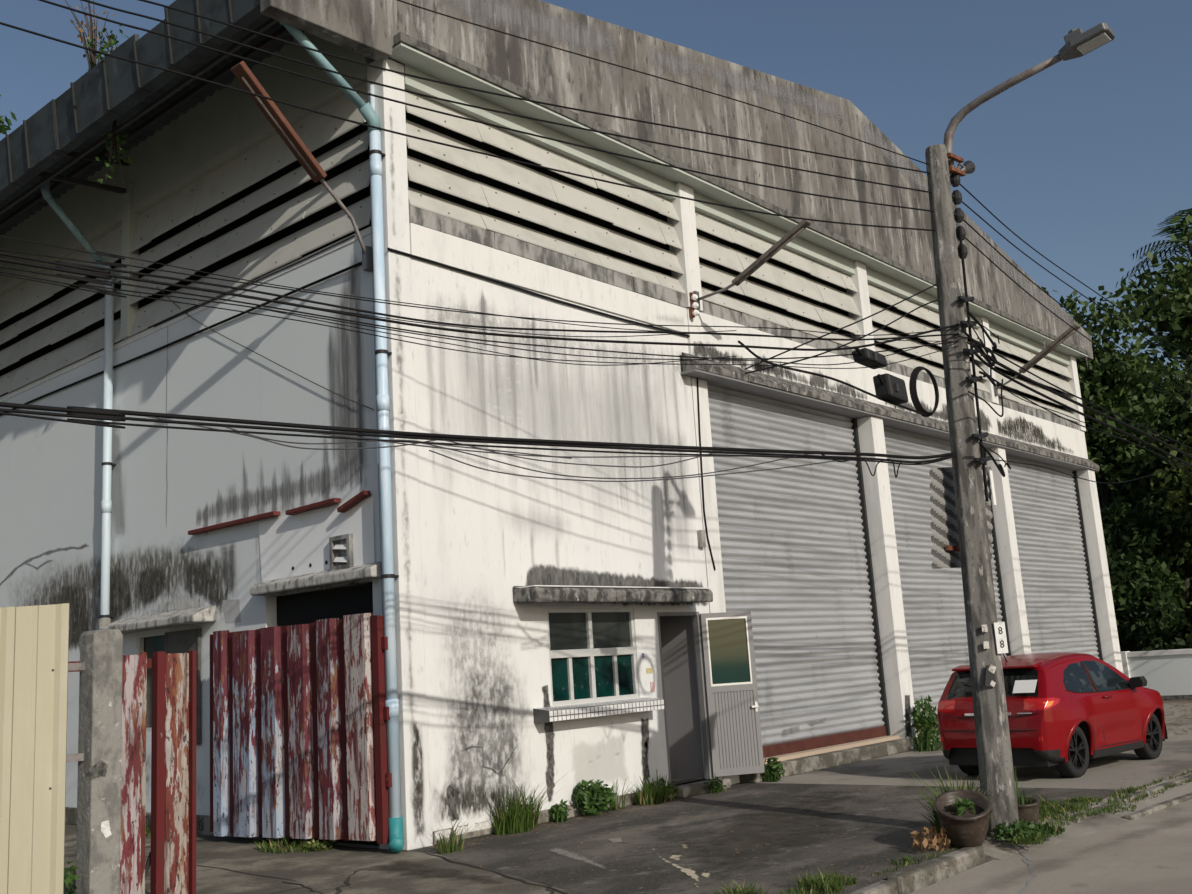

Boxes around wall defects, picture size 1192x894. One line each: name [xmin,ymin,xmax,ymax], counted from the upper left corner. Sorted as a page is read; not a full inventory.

water stain [198,268,363,527]
mould [694,346,867,399]
mould [885,402,948,421]
mould [976,410,1071,451]
water stain [29,545,234,647]
water stain [442,661,520,821]